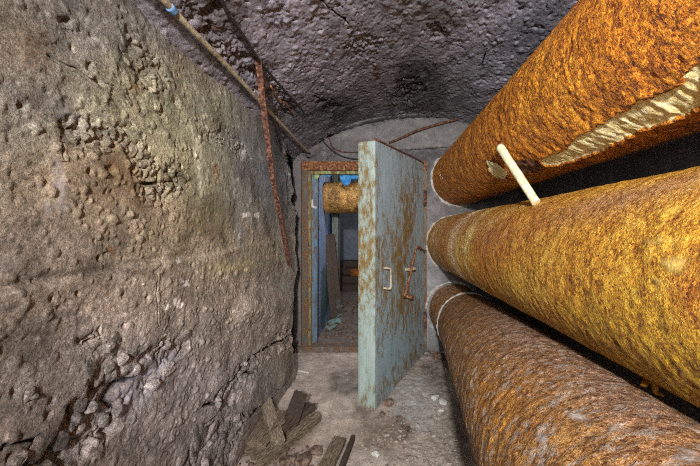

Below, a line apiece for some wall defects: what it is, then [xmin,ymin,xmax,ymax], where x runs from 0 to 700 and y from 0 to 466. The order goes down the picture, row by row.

spalling [46,55,188,209]
spalling [0,322,192,466]
crack [197,334,291,427]